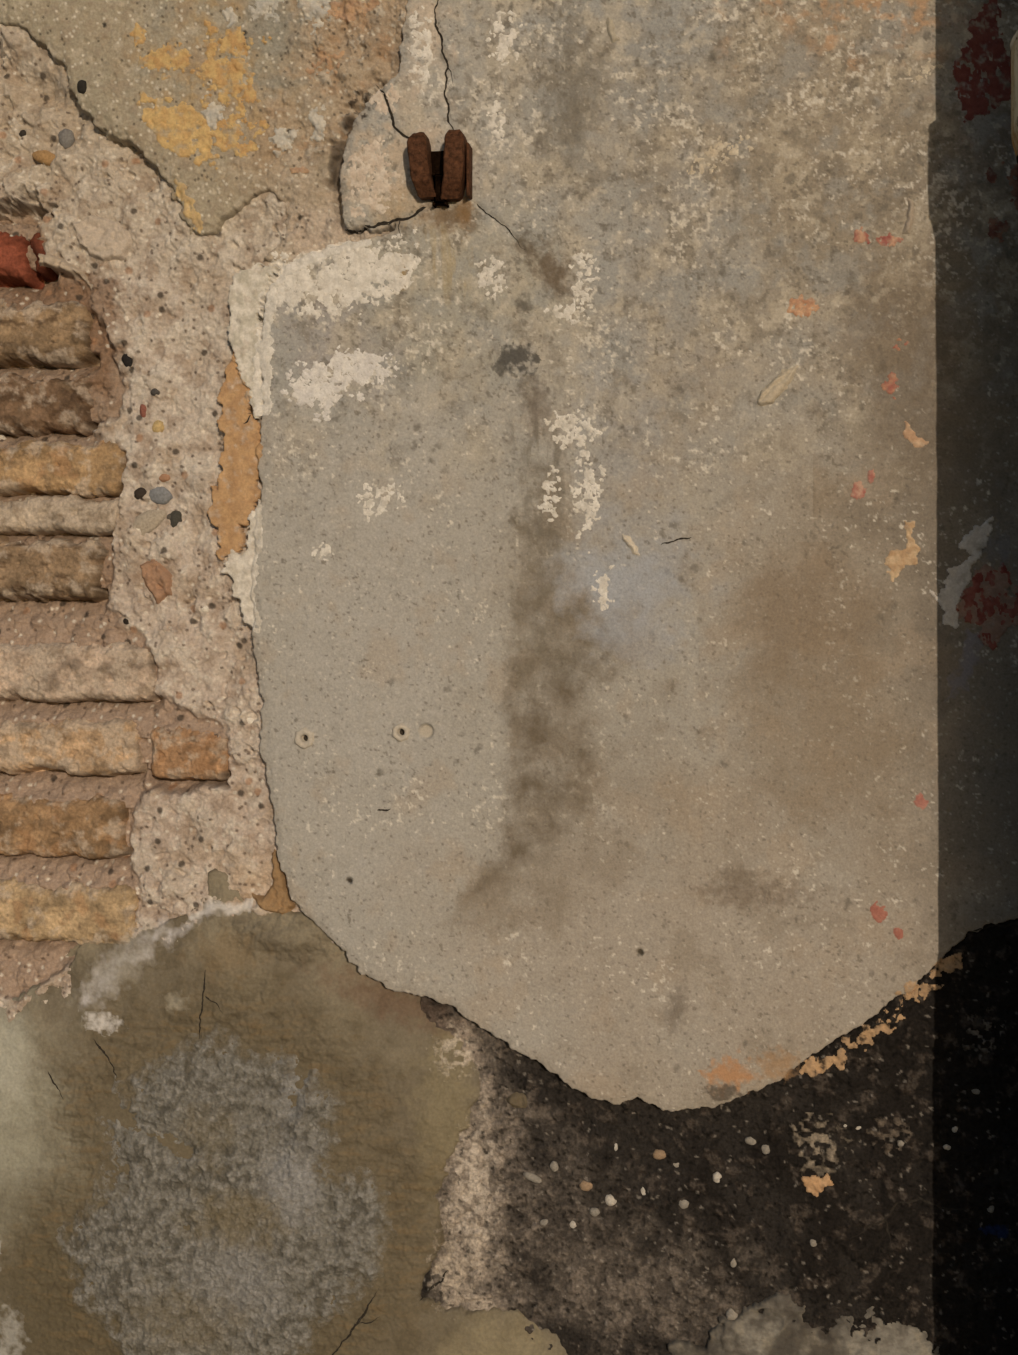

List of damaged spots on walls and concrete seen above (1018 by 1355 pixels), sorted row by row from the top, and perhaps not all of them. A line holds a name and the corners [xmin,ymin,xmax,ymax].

crack [376,85,409,139]
peeling [369,6,435,115]
crack [434,0,454,130]
peeling [486,92,506,143]
peeling [485,10,523,66]
peeling [907,0,1011,123]
crack [346,207,426,236]
crack [477,204,523,249]
spalling [0,0,421,1022]
leakage [434,339,944,943]
peeling [929,516,1018,651]
spalling [421,918,1018,1355]